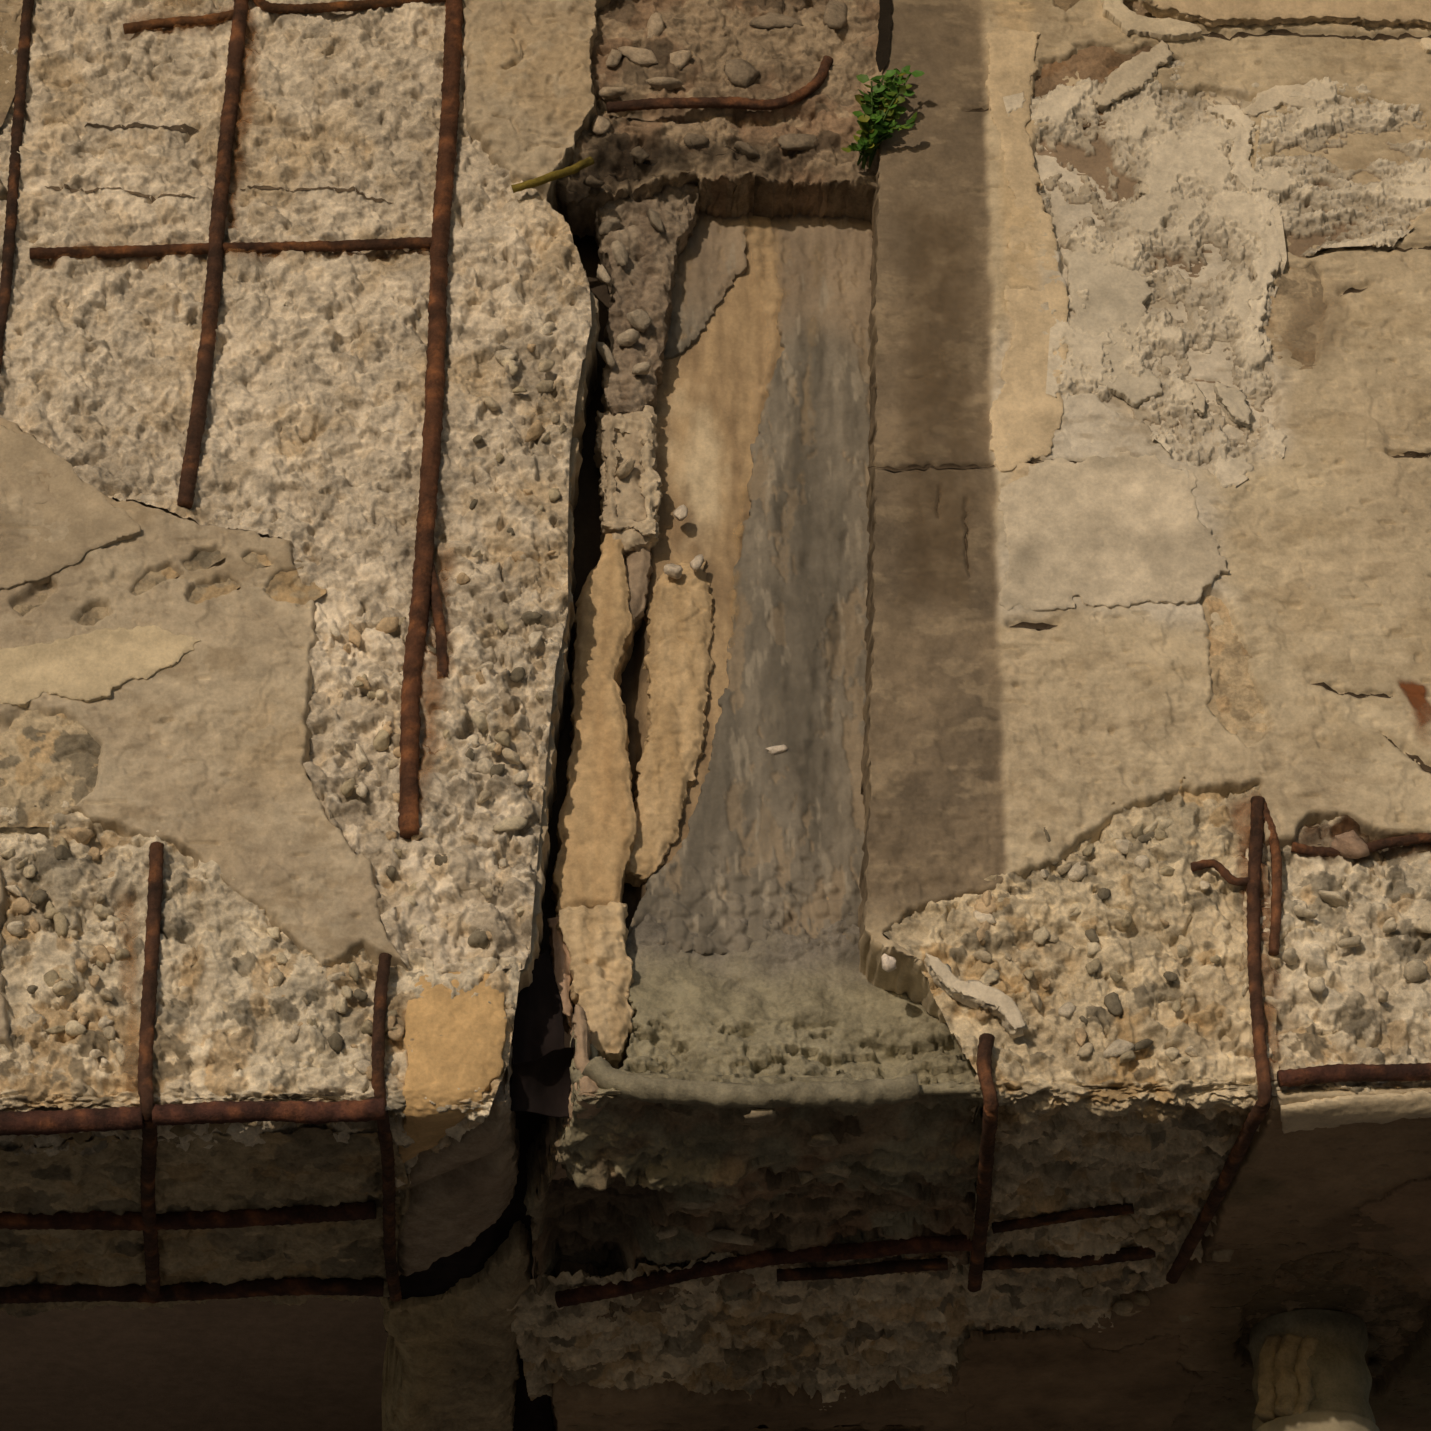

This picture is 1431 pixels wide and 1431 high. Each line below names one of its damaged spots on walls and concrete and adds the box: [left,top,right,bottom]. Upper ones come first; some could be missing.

crack [45,184,197,203]
crack [84,122,199,135]
crack [241,185,391,204]
leakage [748,212,783,350]
flaking render [985,0,1431,739]
spalling [0,0,984,1304]
spalling [507,776,1260,1410]
spalling [1166,796,1282,1284]
spalling [1260,816,1431,1133]
corrosion [1300,815,1431,859]